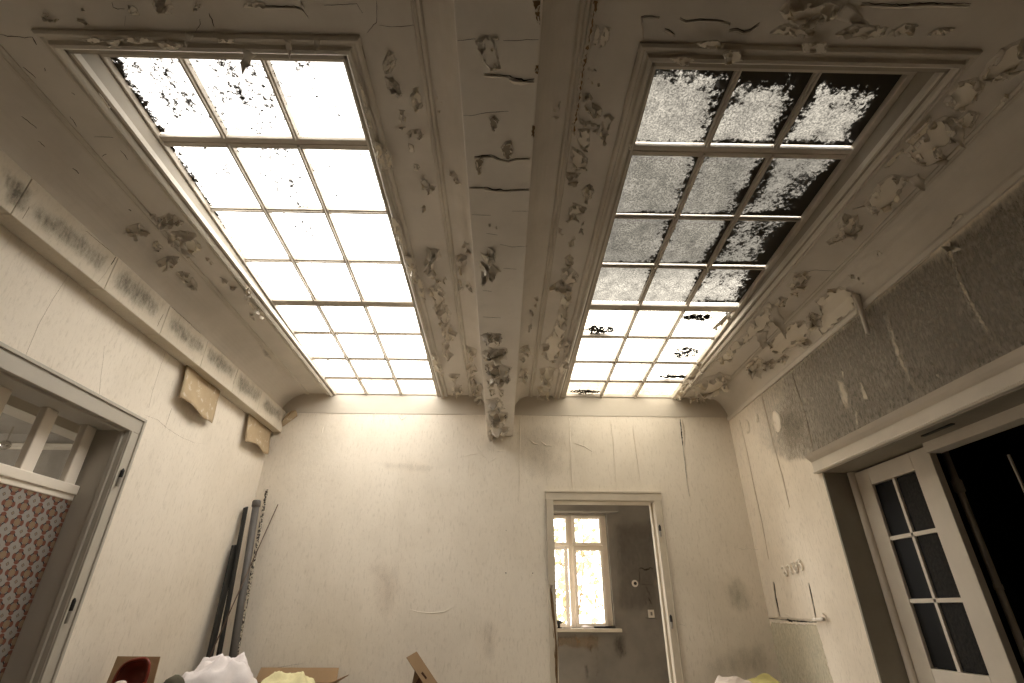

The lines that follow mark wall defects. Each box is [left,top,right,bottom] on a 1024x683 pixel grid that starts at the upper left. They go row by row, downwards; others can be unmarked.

peeling [123,213,214,291]
peeling [382,51,436,213]
crack [469,186,527,194]
crack [474,155,530,163]
peeling [391,67,614,442]
crack [485,74,534,85]
peeling [826,39,1024,246]
flaking render [673,271,871,404]